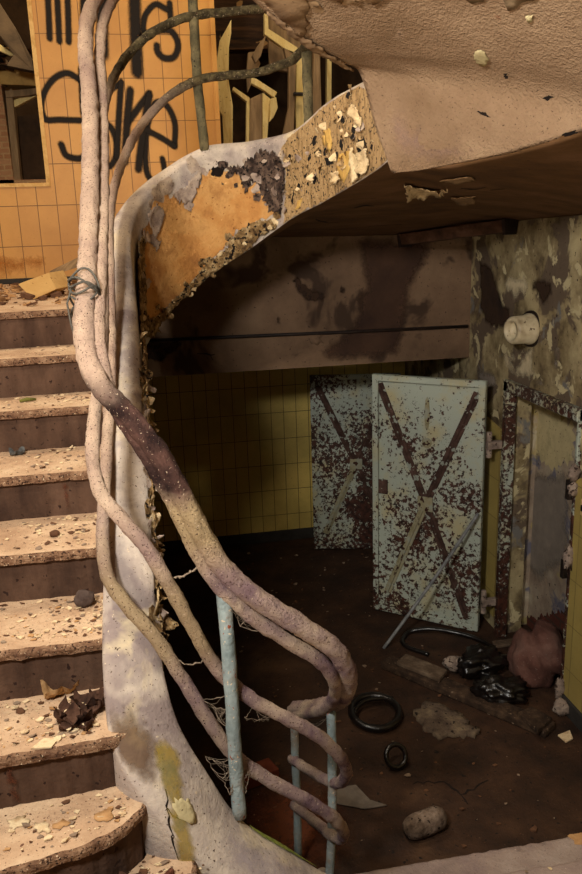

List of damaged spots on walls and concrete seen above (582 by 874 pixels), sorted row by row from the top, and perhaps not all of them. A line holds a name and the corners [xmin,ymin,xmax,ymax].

peeling [264,0,354,72]
spalling [473,50,489,67]
peeling [503,0,534,11]
peeling [404,177,475,207]
peeling [137,148,287,433]
damp [327,239,429,360]
damp [480,263,551,328]
damp [505,351,533,376]
peeling [143,467,165,558]
peeling [148,580,179,640]
damp [113,715,193,861]
crack [165,789,179,860]